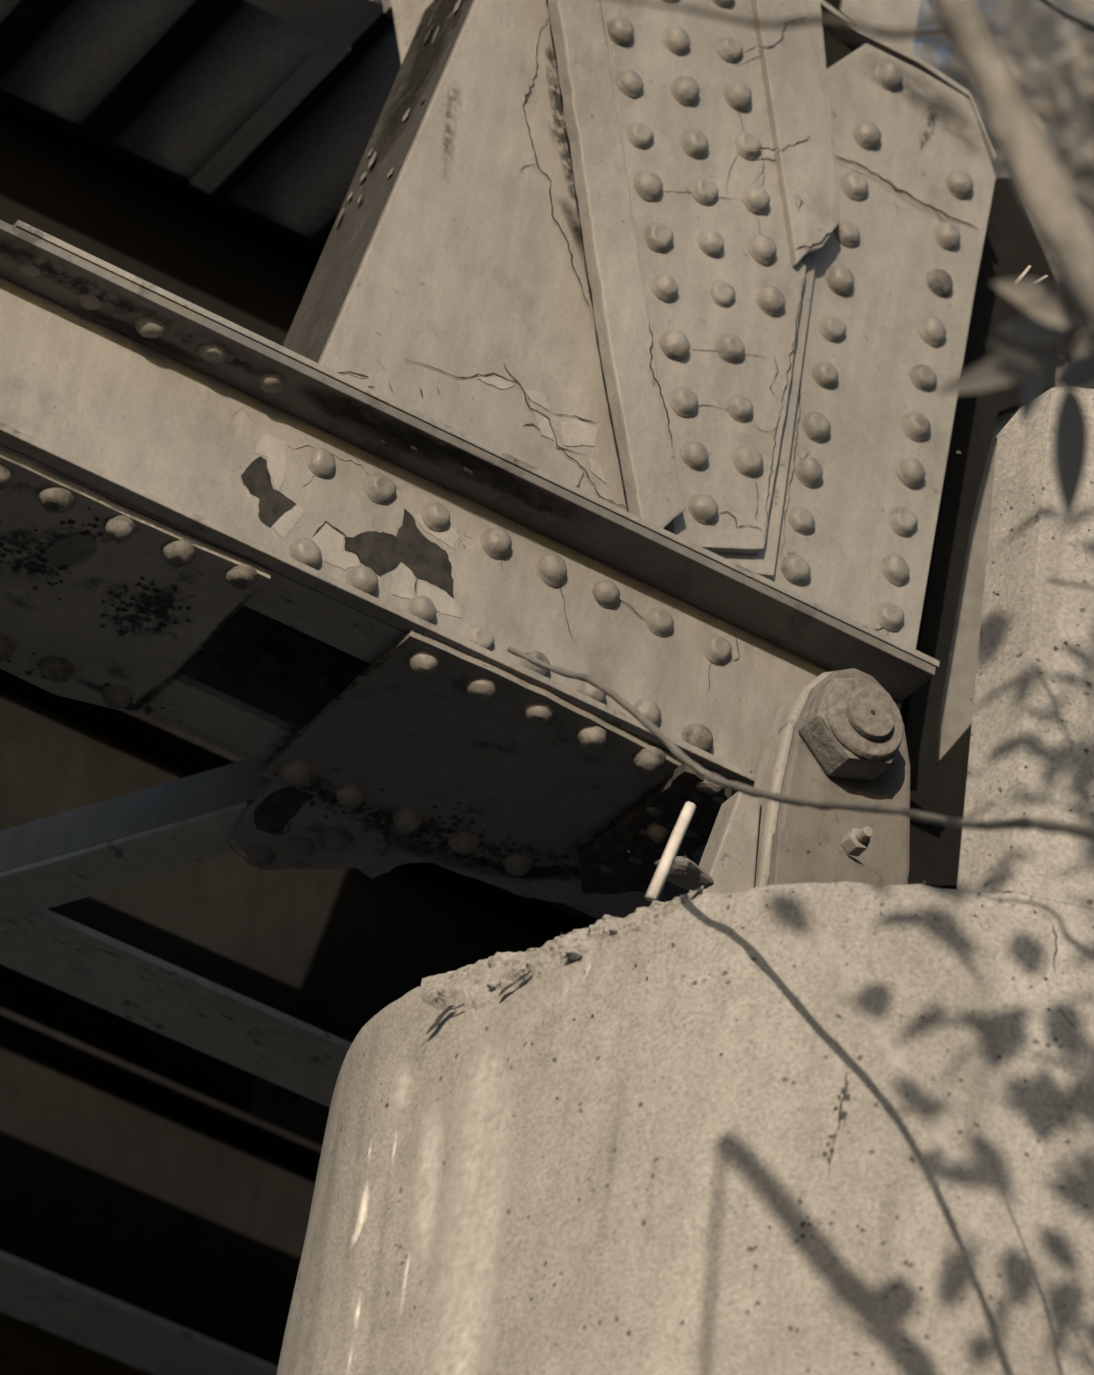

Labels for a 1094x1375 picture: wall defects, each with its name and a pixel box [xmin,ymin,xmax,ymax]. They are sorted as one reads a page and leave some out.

crack [662,110,976,234]
corrosion [0,485,148,600]
corrosion [101,577,193,636]
peeling [241,434,304,539]
peeling [311,508,462,618]
crack [405,359,626,510]
crack [690,279,809,550]
peeling [253,787,314,836]